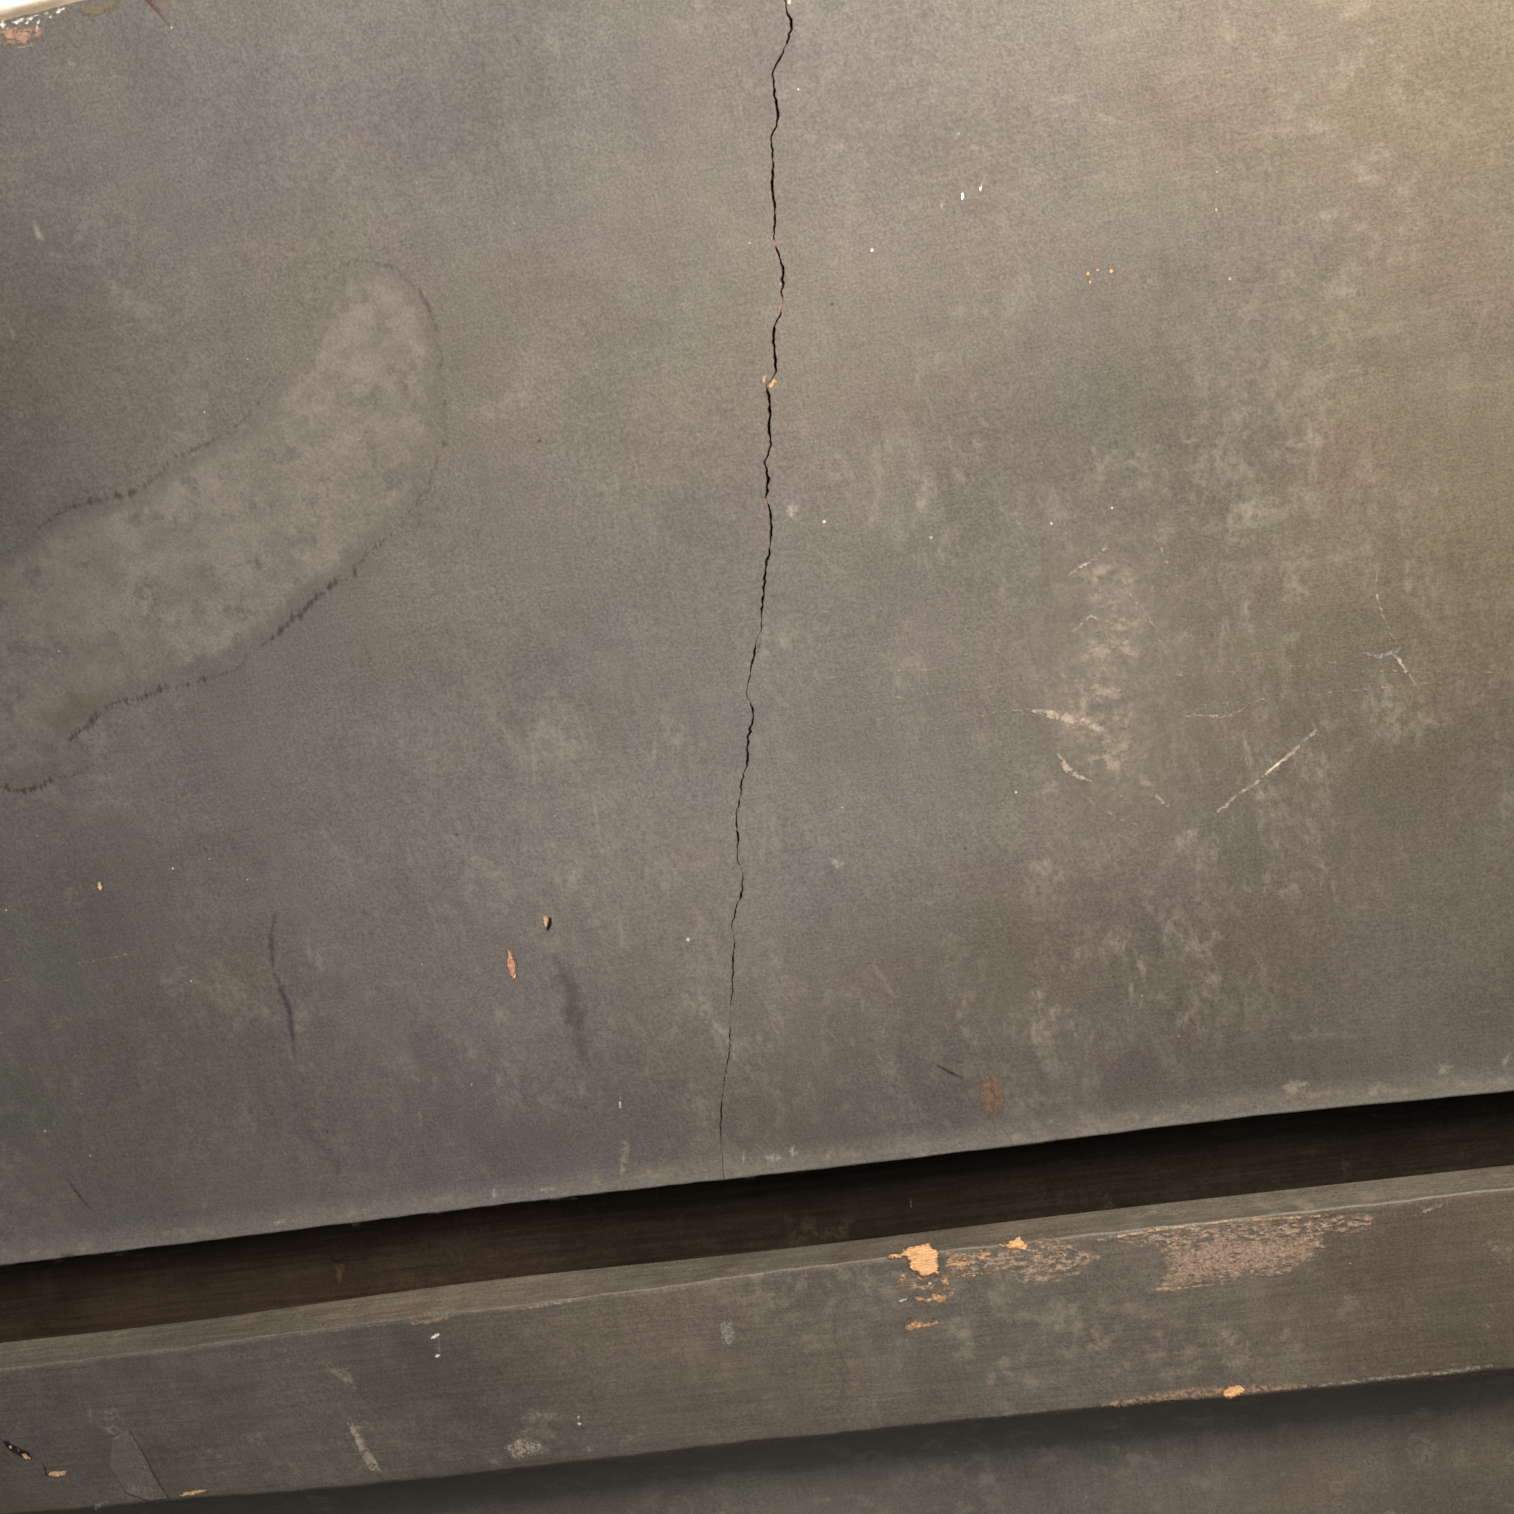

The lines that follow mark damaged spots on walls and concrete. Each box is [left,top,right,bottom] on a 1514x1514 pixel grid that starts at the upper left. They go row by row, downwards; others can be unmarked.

spalling [0,8,64,48]
damp [0,264,431,794]
crack [719,0,793,1178]
peeling [888,1236,1099,1331]
peeling [3,1441,69,1477]